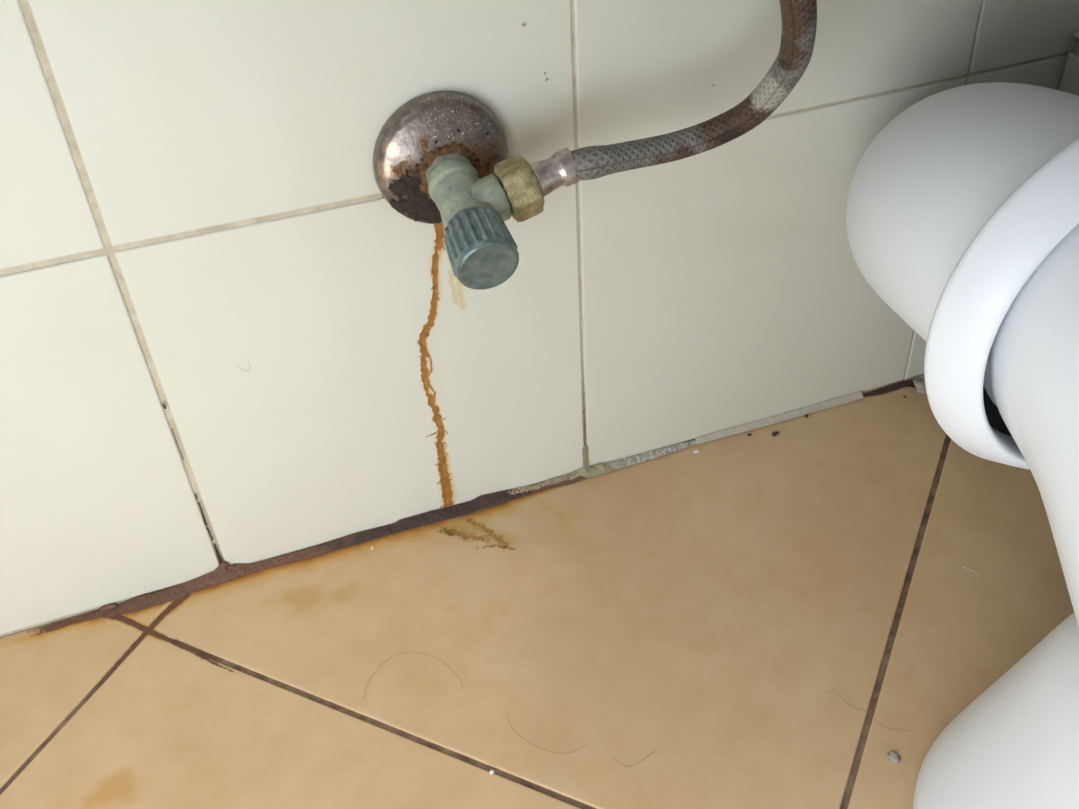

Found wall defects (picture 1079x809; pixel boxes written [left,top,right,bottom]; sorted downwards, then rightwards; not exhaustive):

rust [418,141,480,200]
rust [375,182,599,523]
rust [0,523,458,689]